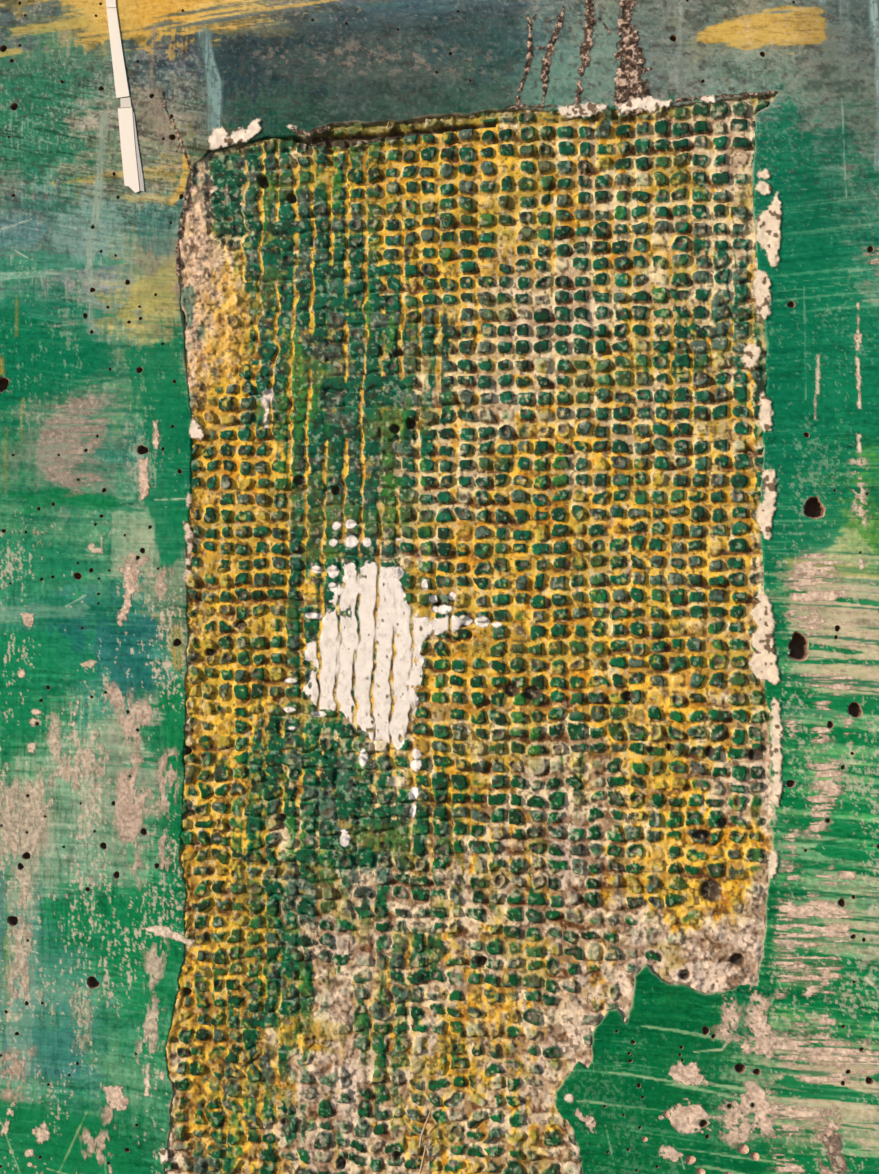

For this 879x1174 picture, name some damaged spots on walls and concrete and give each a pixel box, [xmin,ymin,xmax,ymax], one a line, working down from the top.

peeling [40,398,106,492]
peeling [21,613,34,627]
peeling [117,552,148,626]
spalling [138,94,879,1174]
peeling [106,684,152,881]
peeling [0,700,109,1015]
peeling [75,984,90,1049]
peeling [25,1123,50,1173]
peeling [83,1085,129,1174]